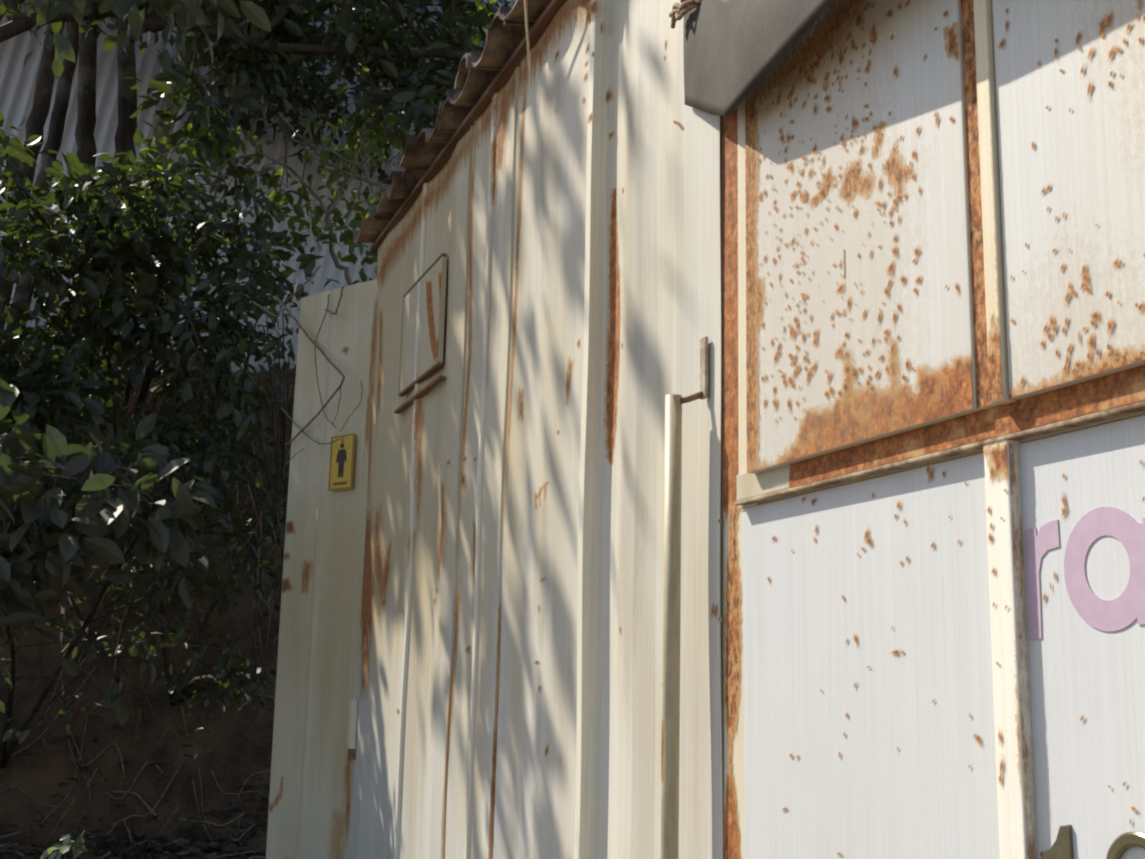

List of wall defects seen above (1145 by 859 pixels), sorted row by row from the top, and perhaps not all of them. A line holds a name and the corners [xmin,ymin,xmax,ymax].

corrosion [360,301,391,699]
corrosion [413,389,424,518]
corrosion [377,0,604,498]
corrosion [604,187,623,464]
corrosion [711,0,1145,859]
corrosion [441,583,470,859]
corrosion [488,605,501,859]